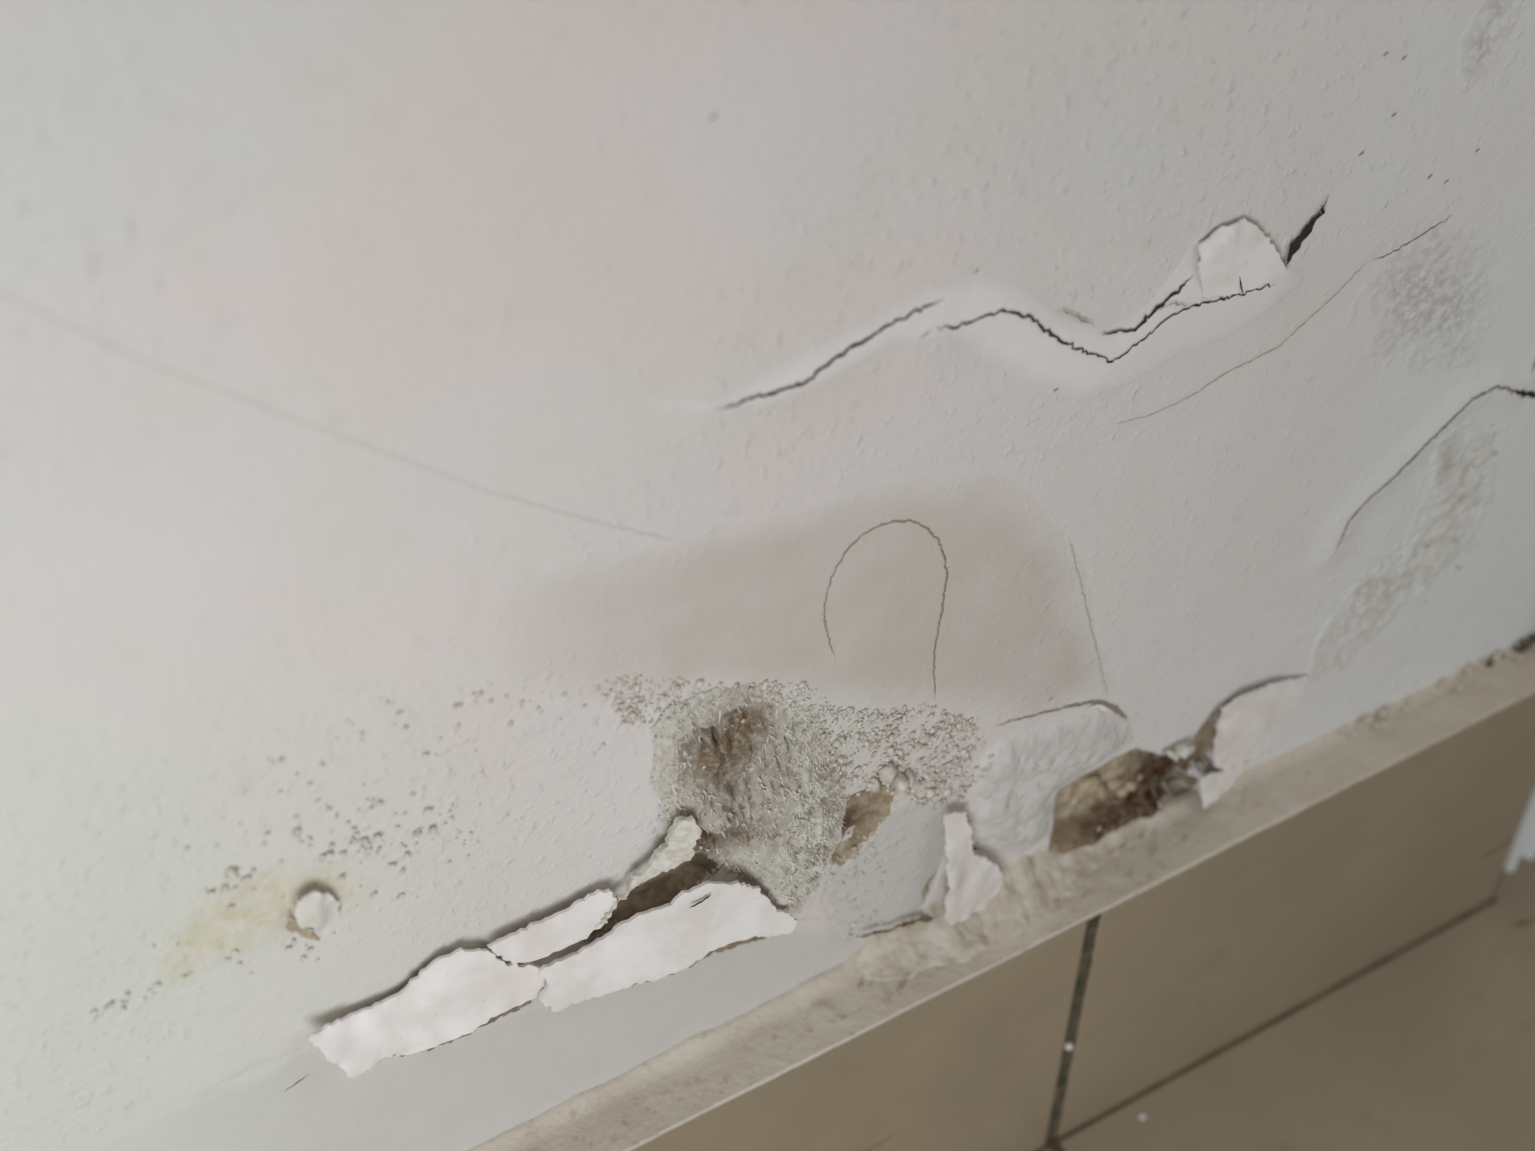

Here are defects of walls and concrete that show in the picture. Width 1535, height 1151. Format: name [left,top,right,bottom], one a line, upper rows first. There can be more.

crack [716,194,1330,410]
crack [1110,215,1452,426]
crack [1337,365,1535,549]
peeling [204,800,397,962]
peeling [306,807,798,1078]
spalling [811,704,1004,941]
spalling [1049,675,1308,854]